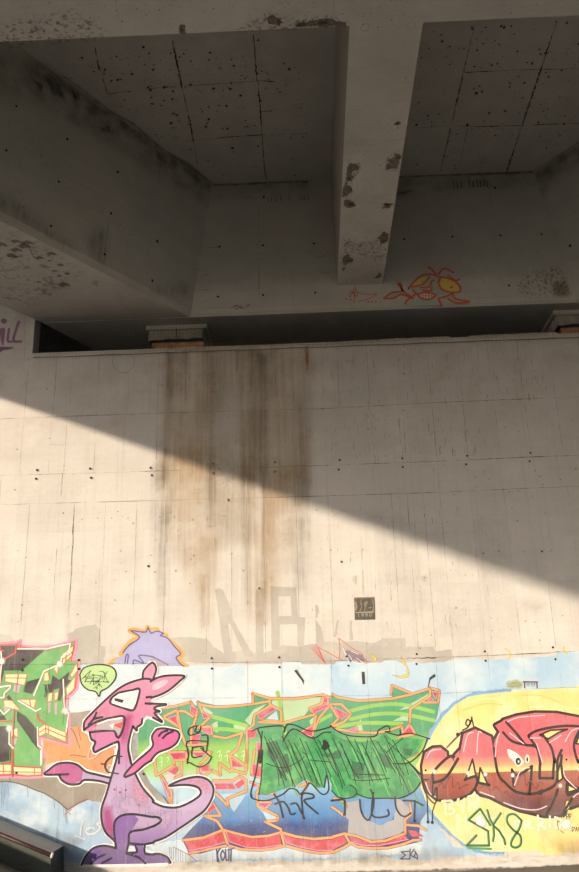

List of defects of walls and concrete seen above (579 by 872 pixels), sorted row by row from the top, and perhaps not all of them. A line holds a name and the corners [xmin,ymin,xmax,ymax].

spalling [294,14,346,28]
spalling [342,163,359,208]